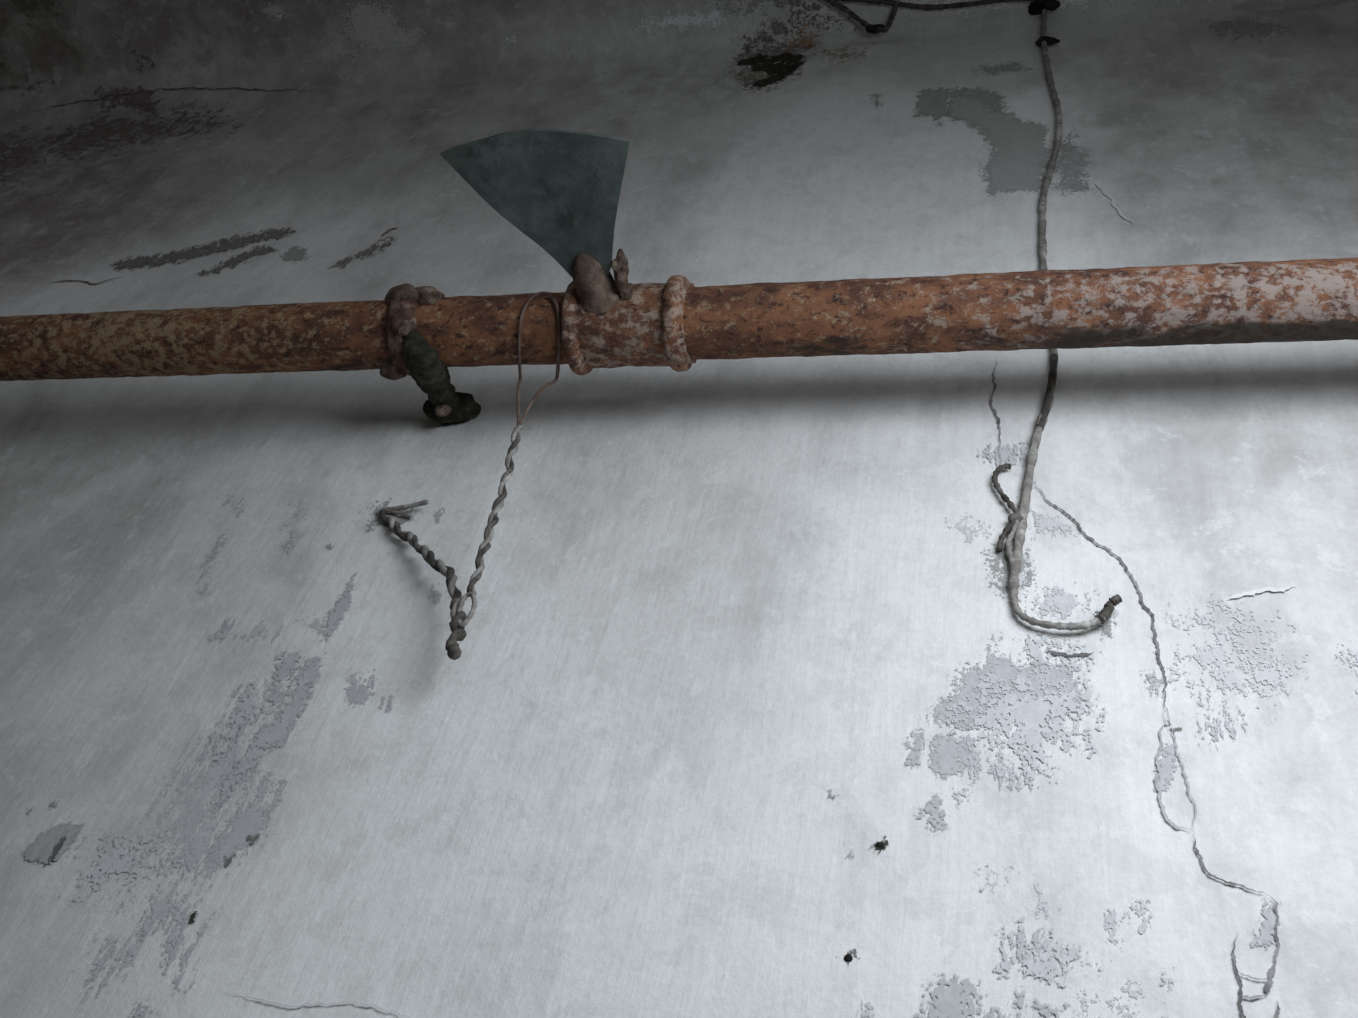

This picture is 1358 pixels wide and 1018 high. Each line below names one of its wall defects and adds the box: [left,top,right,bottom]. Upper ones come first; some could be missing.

peeling [912,61,1097,197]
peeling [48,226,309,285]
peeling [328,227,400,269]
peeling [904,630,1108,831]
crack [1033,483,1280,1018]
spalling [23,821,85,868]